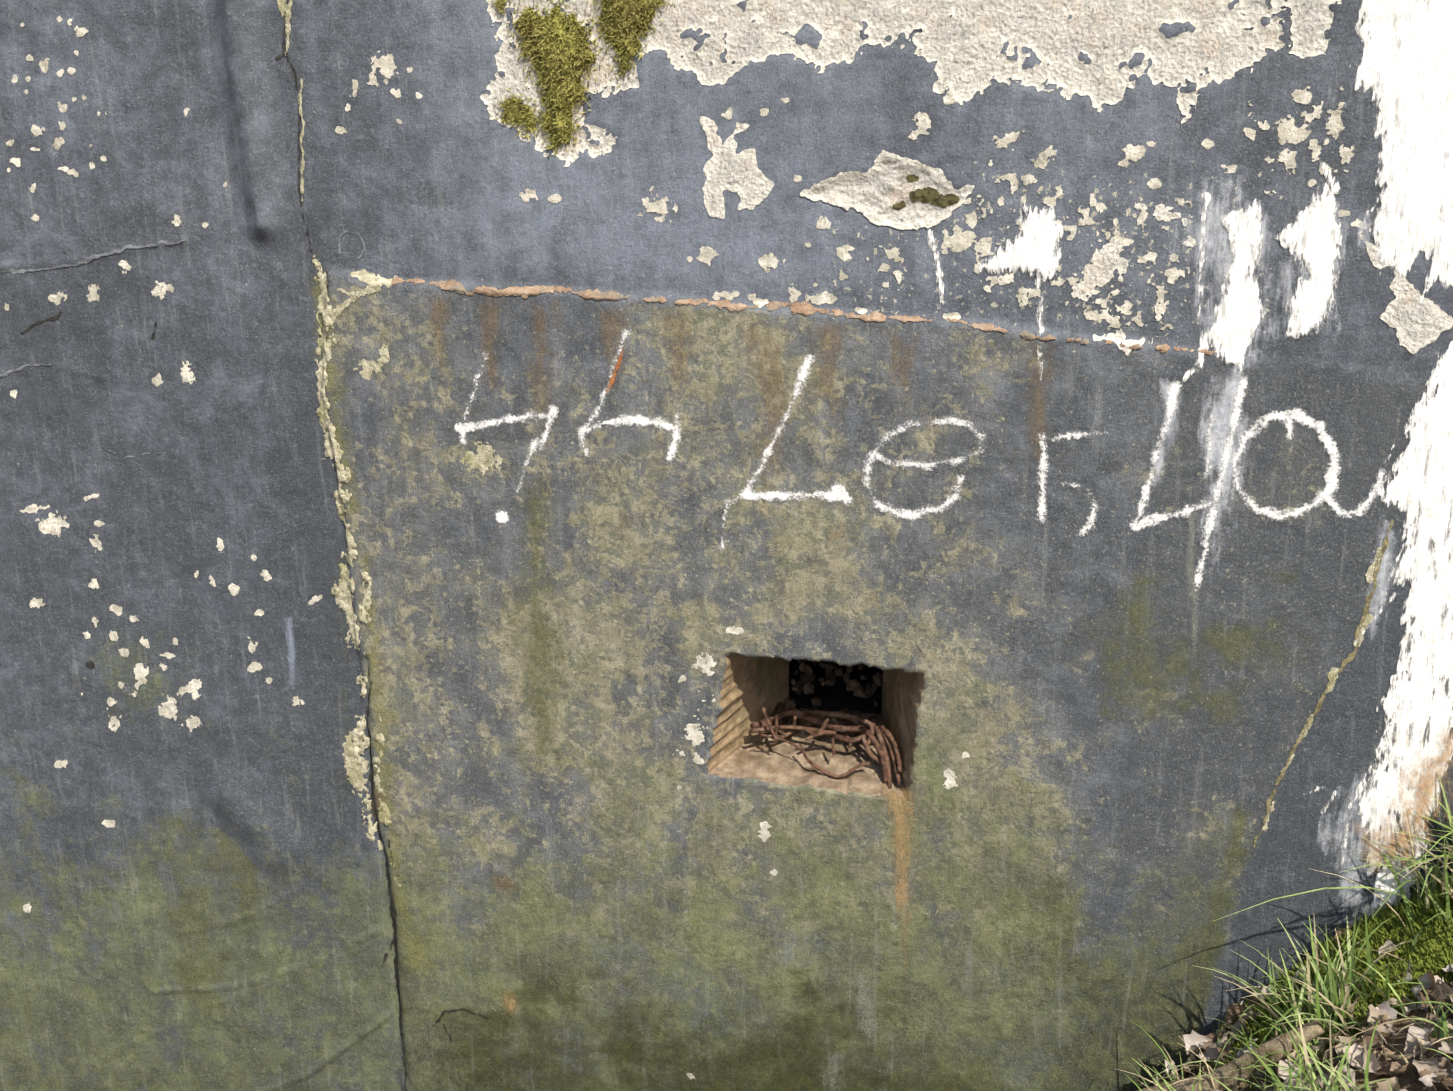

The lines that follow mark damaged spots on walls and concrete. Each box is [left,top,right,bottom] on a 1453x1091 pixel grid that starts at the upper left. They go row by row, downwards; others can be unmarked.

peeling [11,16,88,94]
peeling [6,95,107,177]
crack [271,0,315,259]
peeling [700,98,790,219]
peeling [480,0,1342,168]
spalling [758,130,1197,356]
peeling [1243,86,1453,354]
rust [391,276,1215,355]
peeling [20,504,69,537]
peeling [83,604,178,732]
peeling [158,679,202,732]
crack [1253,519,1394,848]